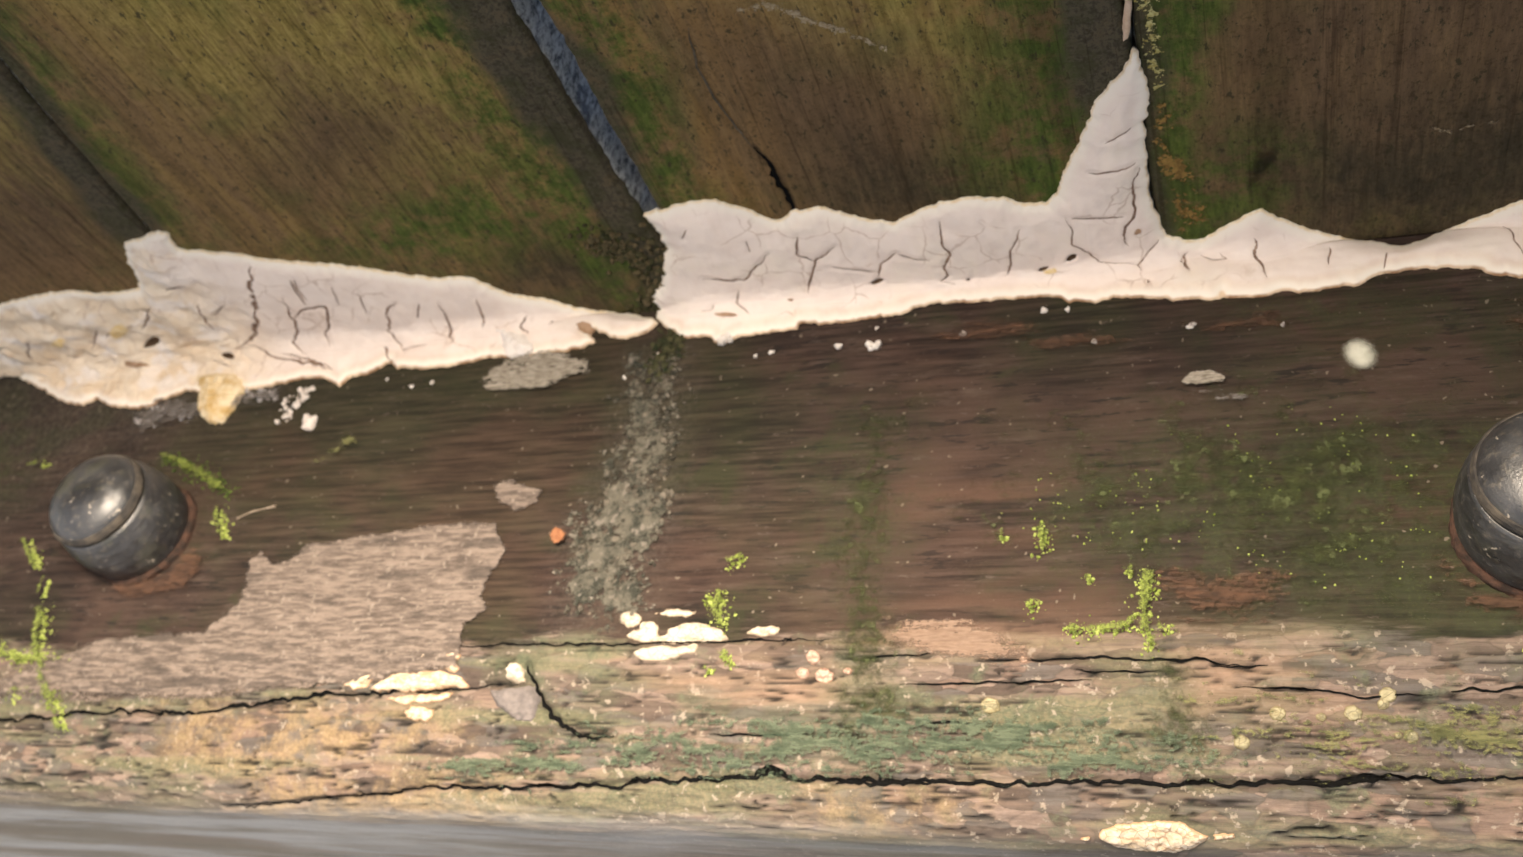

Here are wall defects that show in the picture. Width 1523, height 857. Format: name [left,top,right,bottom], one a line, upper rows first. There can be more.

crack [688,27,952,313]
crack [1007,230,1019,275]
crack [1065,128,1267,277]
peeling [493,479,541,511]
water stain [548,348,692,633]
rust [113,548,202,598]
peeling [0,521,505,705]
crack [0,638,826,741]
crack [856,653,1523,727]
crack [240,733,1523,808]